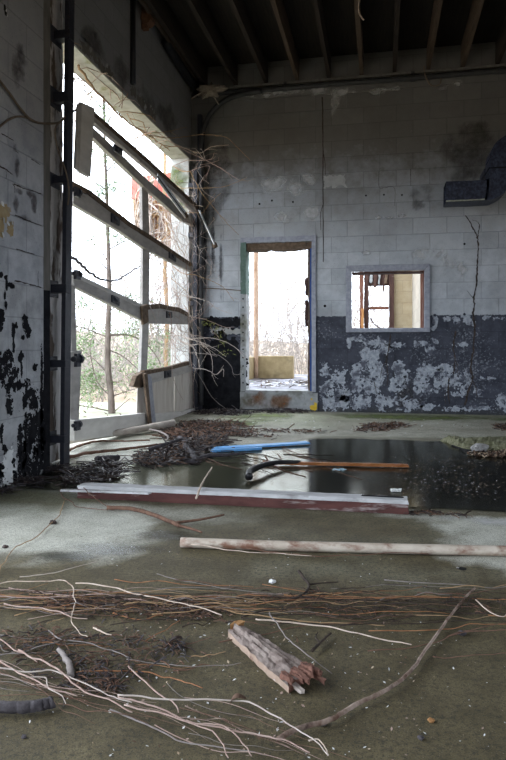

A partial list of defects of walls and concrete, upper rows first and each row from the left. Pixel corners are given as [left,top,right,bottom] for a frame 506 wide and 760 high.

peeling [0,272,48,489]
peeling [309,313,506,430]